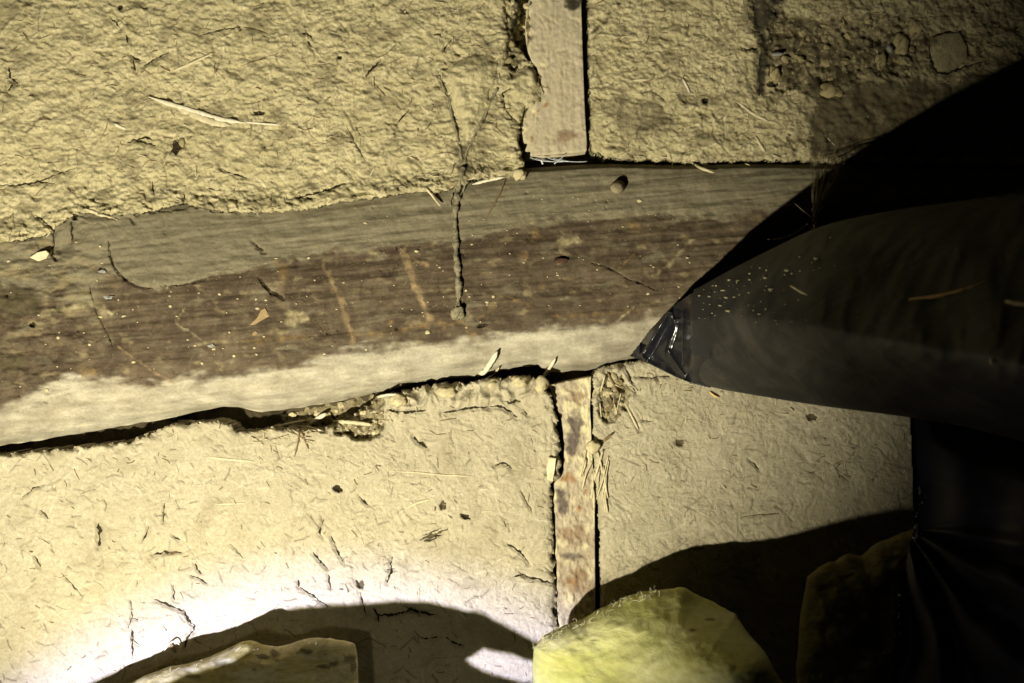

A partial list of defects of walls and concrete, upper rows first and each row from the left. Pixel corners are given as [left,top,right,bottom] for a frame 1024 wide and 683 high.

spalling [766,10,929,96]
crack [388,399,528,448]